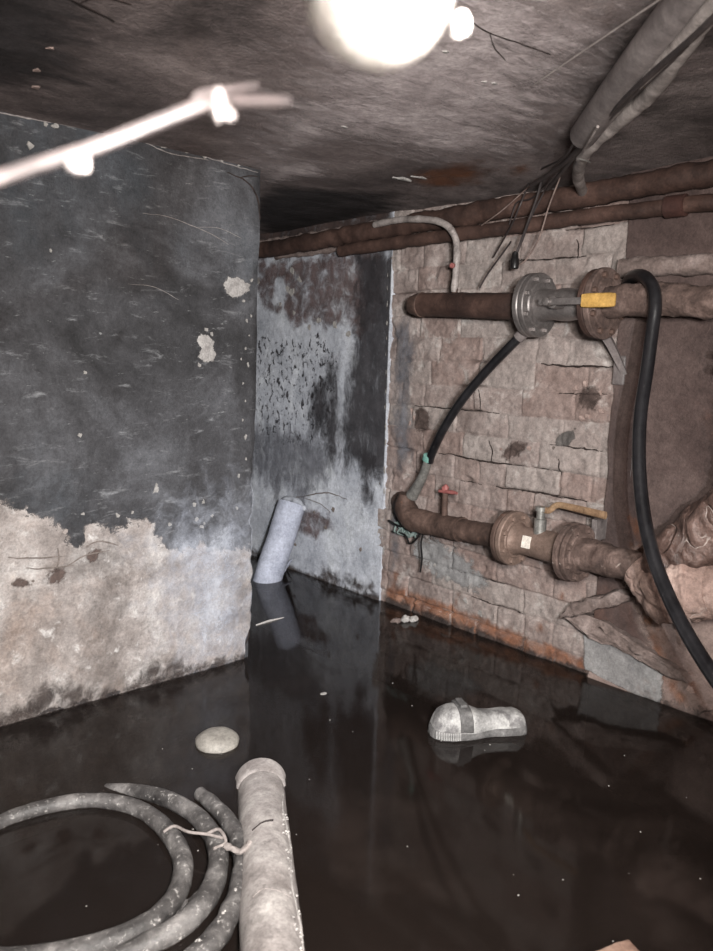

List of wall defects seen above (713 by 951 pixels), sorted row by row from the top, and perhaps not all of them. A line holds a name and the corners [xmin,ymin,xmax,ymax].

spalling [197,328,216,367]
leakage [251,252,392,519]
crack [415,389,500,414]
crack [541,361,613,369]
crack [439,441,602,502]
peeling [0,500,253,726]
corrosion [387,589,529,651]
crack [443,566,523,614]